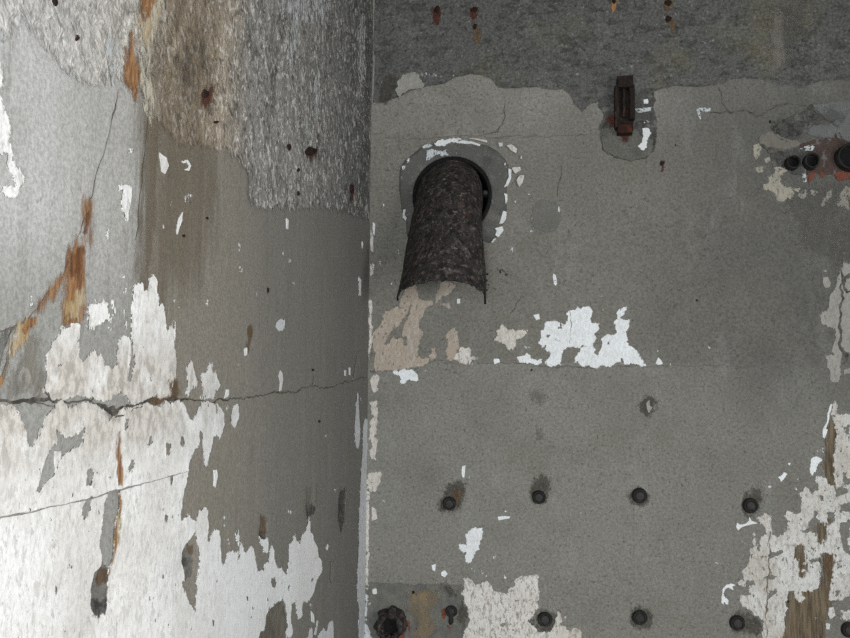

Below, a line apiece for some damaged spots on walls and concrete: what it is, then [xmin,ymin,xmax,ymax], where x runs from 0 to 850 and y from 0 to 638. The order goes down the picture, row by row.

rust [123,0,161,102]
rust [431,5,441,25]
rust [470,7,481,45]
flaking render [0,0,850,252]
rust [0,196,93,401]
crack [0,87,850,421]
peeling [494,306,646,368]
crack [0,473,180,519]
rust [109,434,123,575]
peeling [0,274,335,638]
peeling [721,402,850,638]
peeling [461,571,582,638]